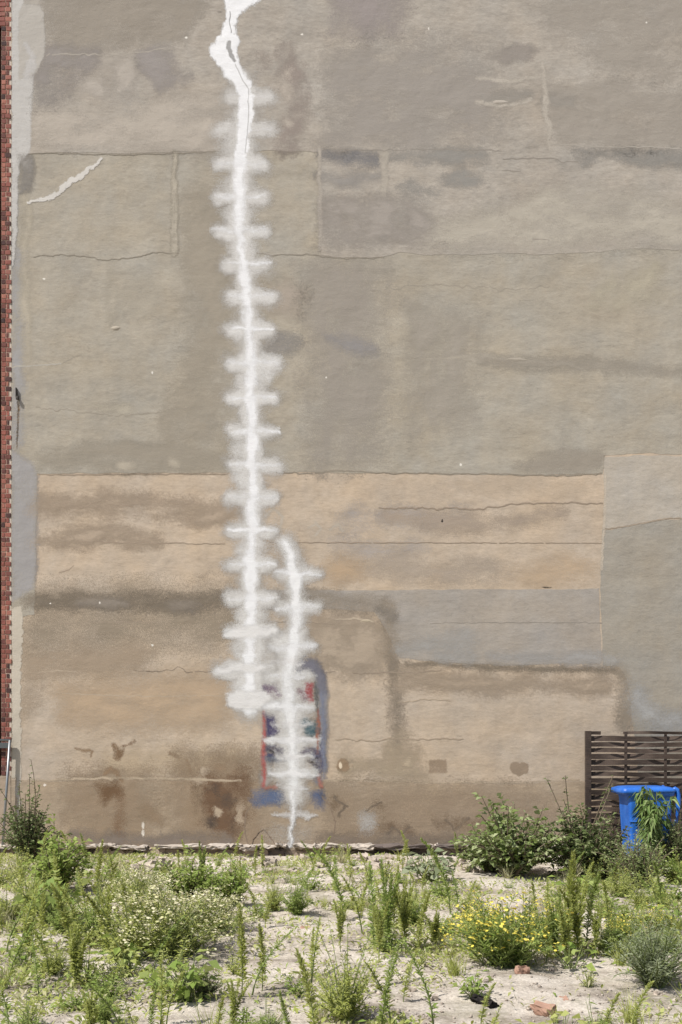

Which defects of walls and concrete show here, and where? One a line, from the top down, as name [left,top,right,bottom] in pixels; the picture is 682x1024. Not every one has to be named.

crack [235,64,249,153]
crack [257,252,384,260]
water stain [11,177,285,854]
crack [273,501,682,544]